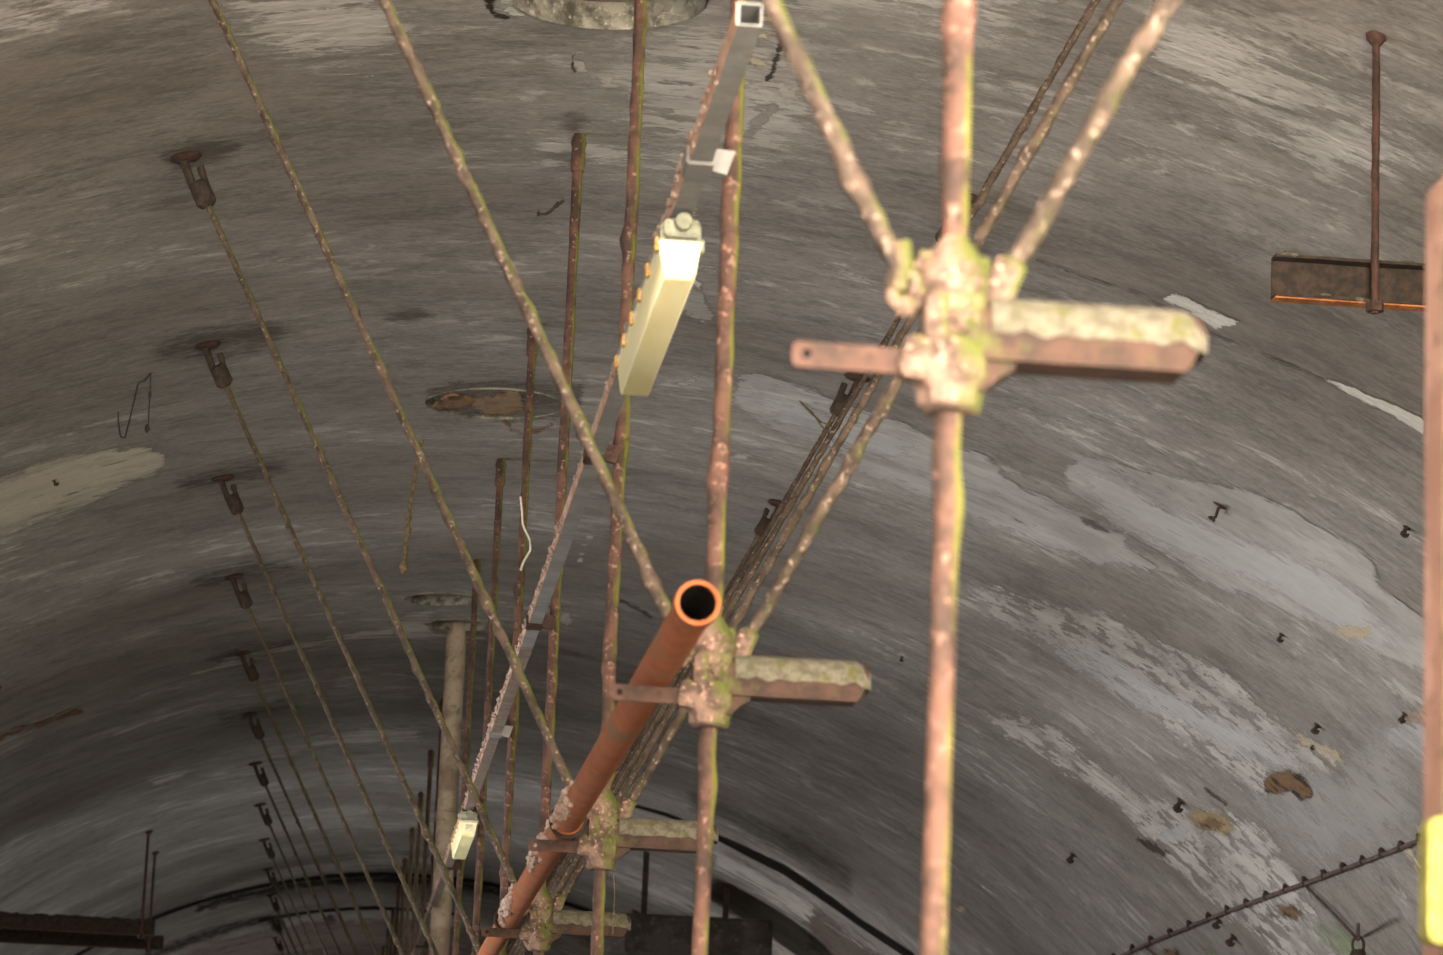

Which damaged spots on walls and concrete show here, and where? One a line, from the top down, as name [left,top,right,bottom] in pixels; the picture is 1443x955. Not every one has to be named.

peeling [0,444,166,538]
peeling [732,374,933,500]
peeling [961,448,1424,670]
peeling [965,585,1344,803]
peeling [980,706,1336,955]